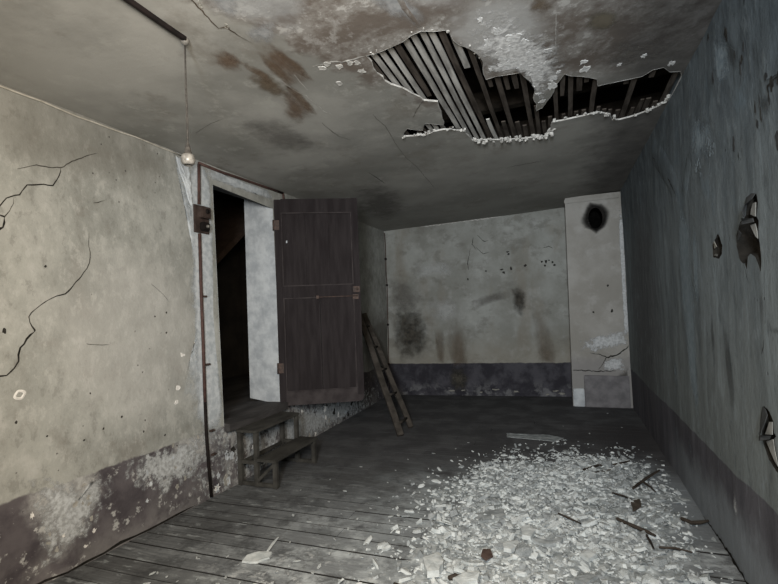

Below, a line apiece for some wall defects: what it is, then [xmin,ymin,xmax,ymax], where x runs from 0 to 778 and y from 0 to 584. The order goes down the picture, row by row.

crack [191,0,246,40]
peeling [473,11,563,103]
water stain [714,44,728,80]
water stain [259,78,302,117]
spalling [754,71,778,128]
crack [0,153,96,230]
crack [0,240,91,377]
water stain [514,292,524,310]
water stain [397,316,424,354]
crack [574,347,628,372]